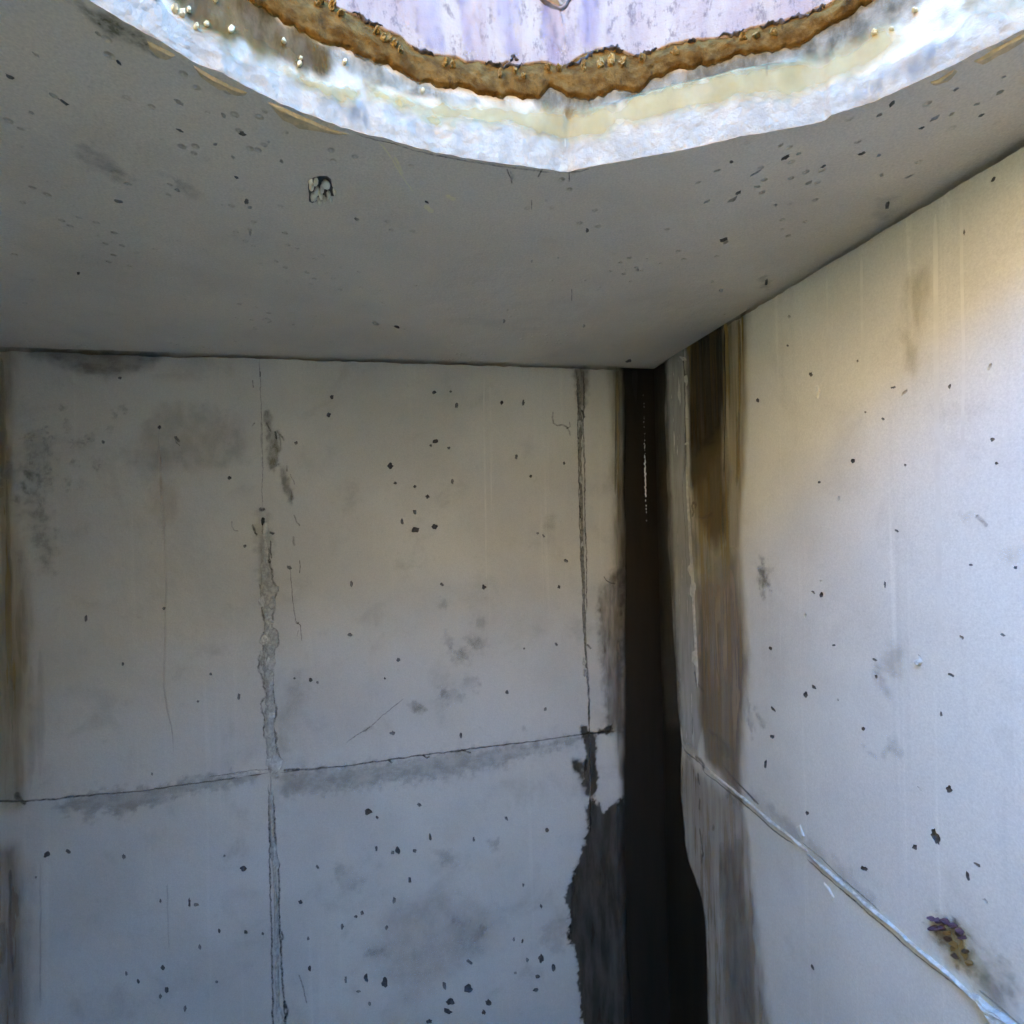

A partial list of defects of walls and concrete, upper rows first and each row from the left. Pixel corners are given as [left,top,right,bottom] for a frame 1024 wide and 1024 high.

corrosion [176,0,333,75]
spalling [308,176,337,205]
crack [0,387,598,805]
water stain [564,362,708,1024]
crack [268,799,288,1024]
crack [683,719,949,980]
corrosion [926,916,974,968]